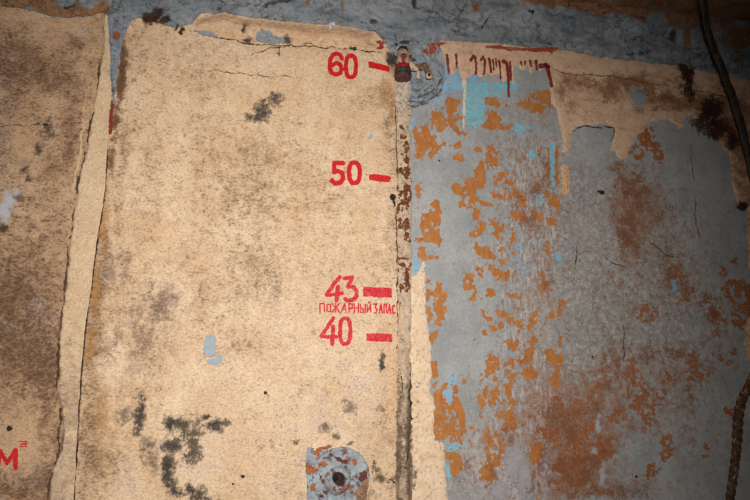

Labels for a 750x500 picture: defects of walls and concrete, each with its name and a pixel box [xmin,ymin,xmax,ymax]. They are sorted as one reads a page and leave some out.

flaking render [256,28,289,44]
crack [215,37,383,55]
water stain [245,91,284,122]
rust [638,63,740,150]
water stain [0,186,24,232]
crack [2,63,101,389]
peeling [395,40,750,500]
rust [609,161,649,251]
crack [47,149,108,500]
water stain [119,394,230,500]
peeling [356,479,369,500]
rust [526,398,648,500]